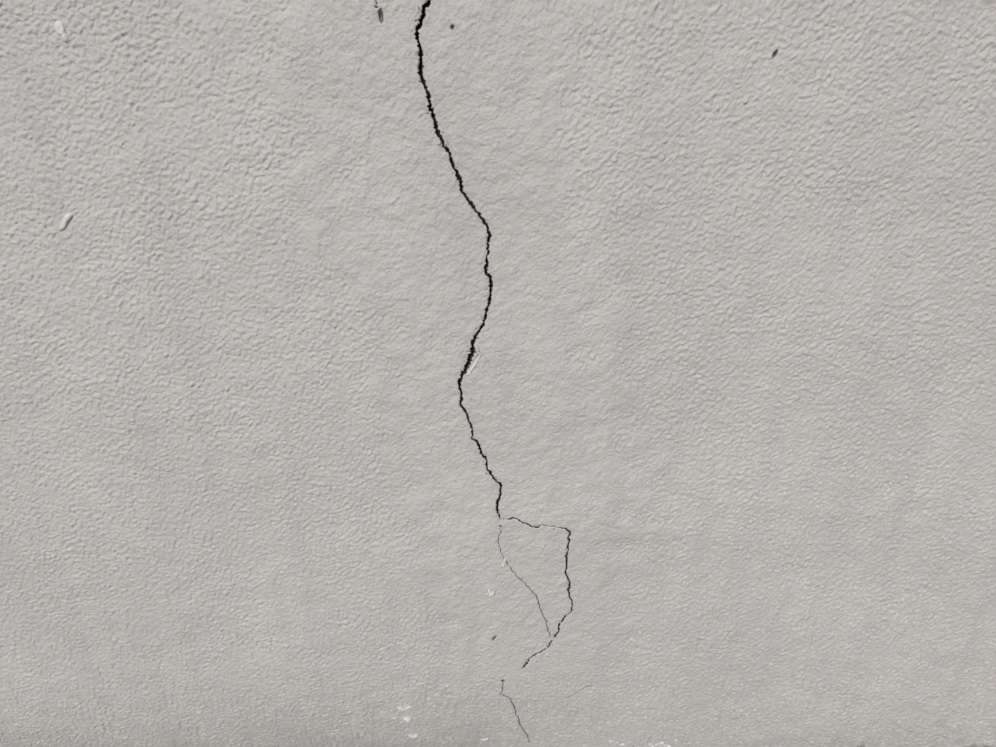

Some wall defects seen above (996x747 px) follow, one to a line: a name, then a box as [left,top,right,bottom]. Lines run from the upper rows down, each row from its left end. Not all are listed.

crack [411,0,576,744]